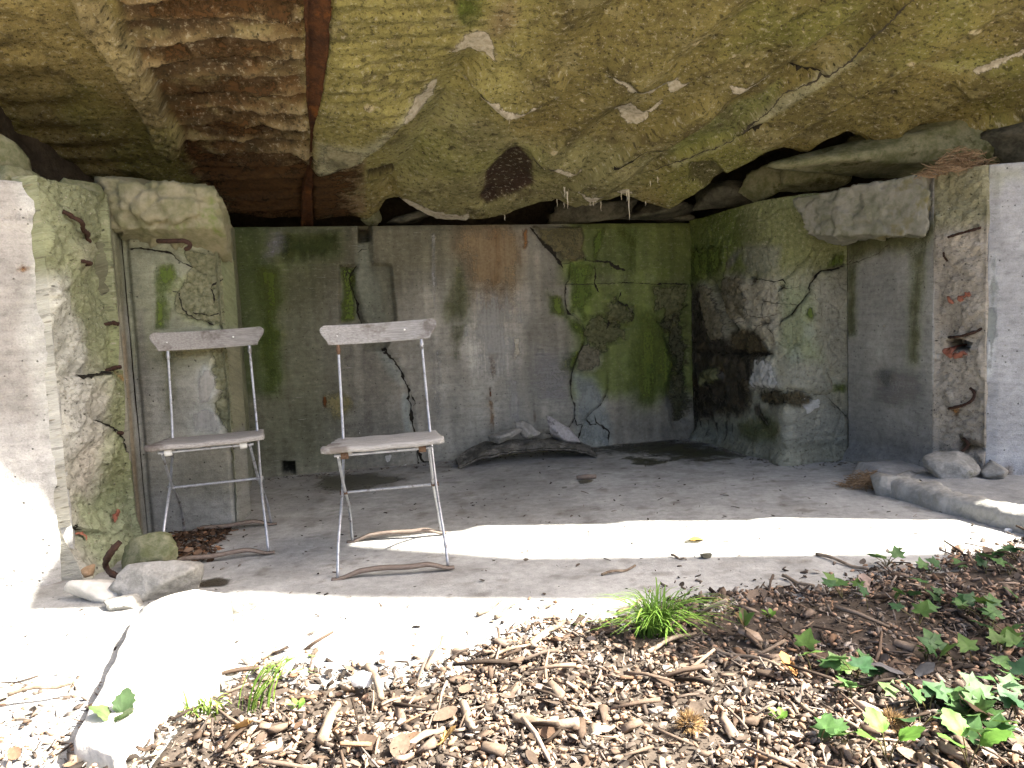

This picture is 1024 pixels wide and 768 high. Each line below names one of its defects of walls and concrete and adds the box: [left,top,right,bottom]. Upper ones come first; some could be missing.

water stain [397,195,470,221]
efflorescence [533,158,603,209]
crack [173,275,224,325]
crack [381,348,428,464]
crack [530,228,685,442]
water stain [691,292,777,440]
crack [704,238,894,357]